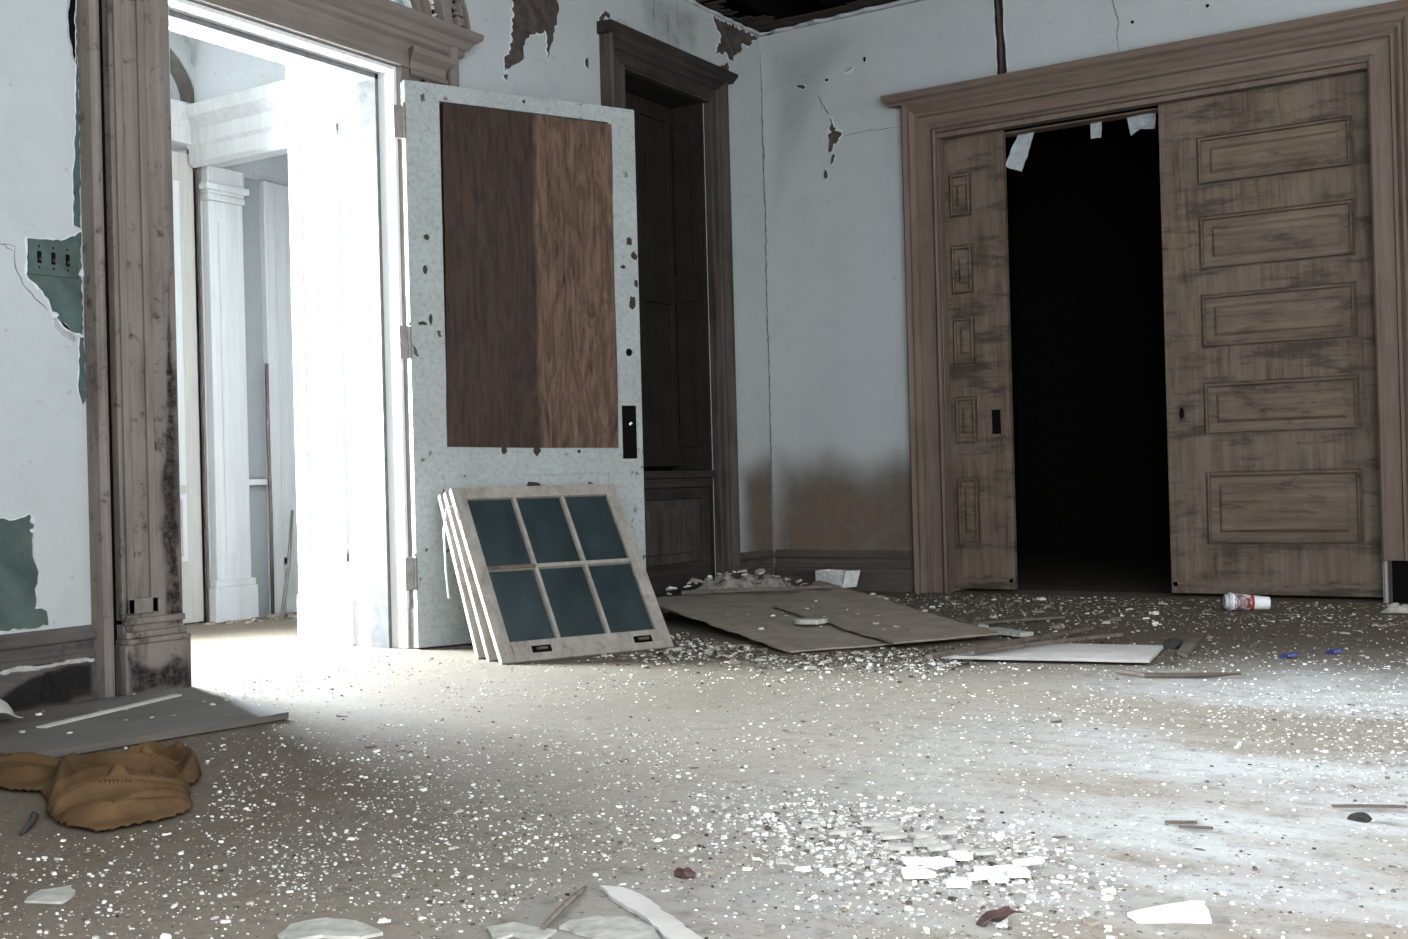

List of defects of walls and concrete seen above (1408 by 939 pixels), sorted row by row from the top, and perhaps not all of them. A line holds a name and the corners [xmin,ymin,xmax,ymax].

flaking render [502,0,560,85]
flaking render [598,11,632,28]
spalling [695,0,899,70]
peeling [24,0,86,406]
crack [0,243,48,311]
peeling [0,512,50,634]